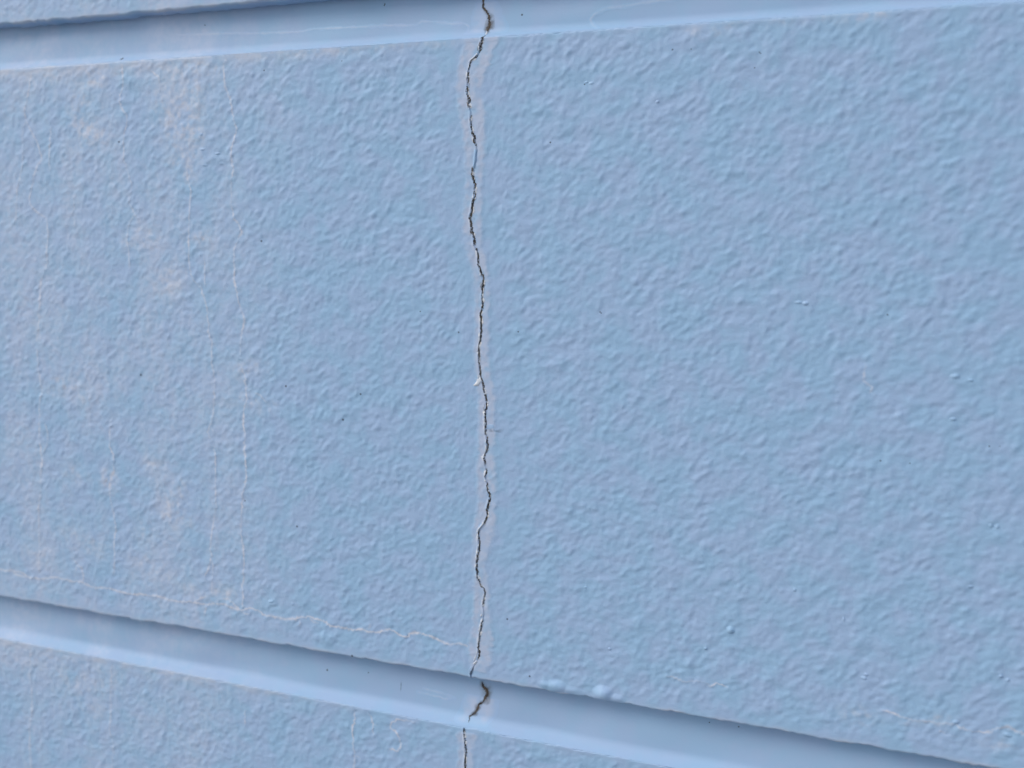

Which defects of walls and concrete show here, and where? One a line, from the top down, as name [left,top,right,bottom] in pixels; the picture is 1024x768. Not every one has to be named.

crack [0,0,509,768]